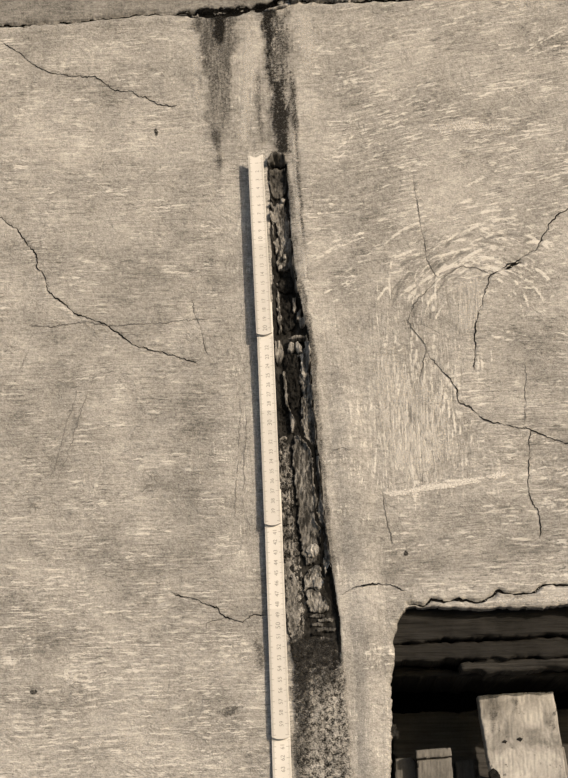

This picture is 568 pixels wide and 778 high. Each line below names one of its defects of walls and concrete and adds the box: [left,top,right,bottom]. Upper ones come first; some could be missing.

crack [0,0,413,107]
damp [192,7,304,234]
crack [0,217,209,364]
crack [408,184,568,538]
crack [171,592,263,630]
crack [291,405,568,616]